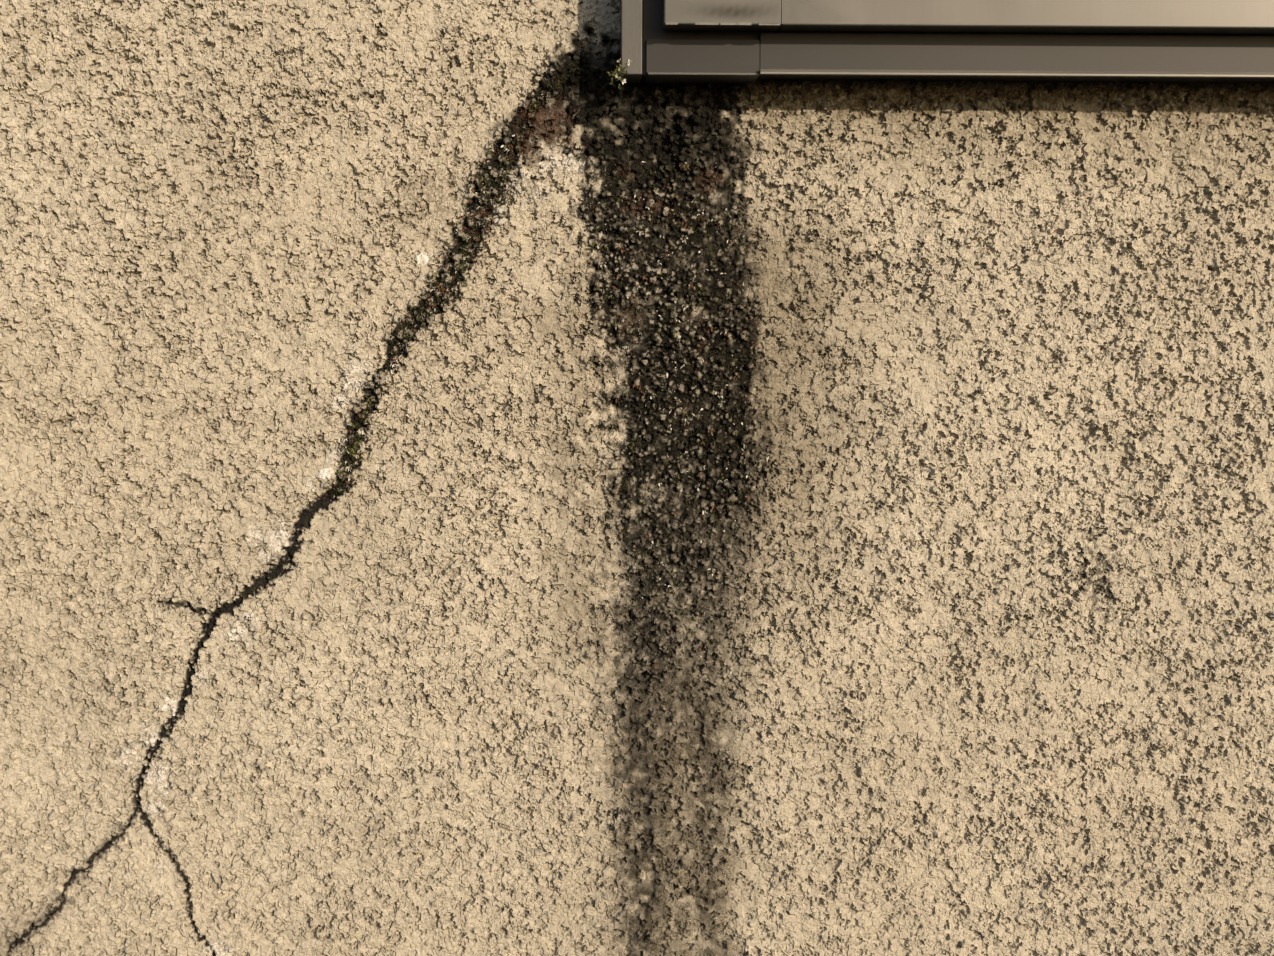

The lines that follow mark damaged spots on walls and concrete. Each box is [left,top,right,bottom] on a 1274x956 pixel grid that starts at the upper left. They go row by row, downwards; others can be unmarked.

crack [7,62,591,956]
water stain [538,25,1274,956]